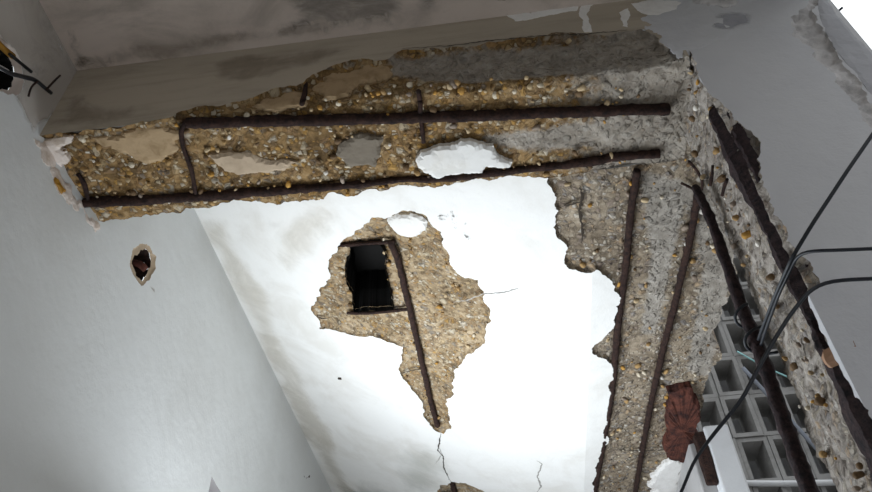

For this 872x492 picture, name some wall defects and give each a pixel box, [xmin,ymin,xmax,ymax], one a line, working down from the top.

spalling [791,0,872,128]
spalling [33,29,795,323]
spalling [311,210,491,434]
spalling [547,142,730,492]
spalling [737,305,767,367]
spalling [759,255,872,492]
crack [436,435,449,478]
spalling [437,481,484,492]
corrosion [693,431,718,486]